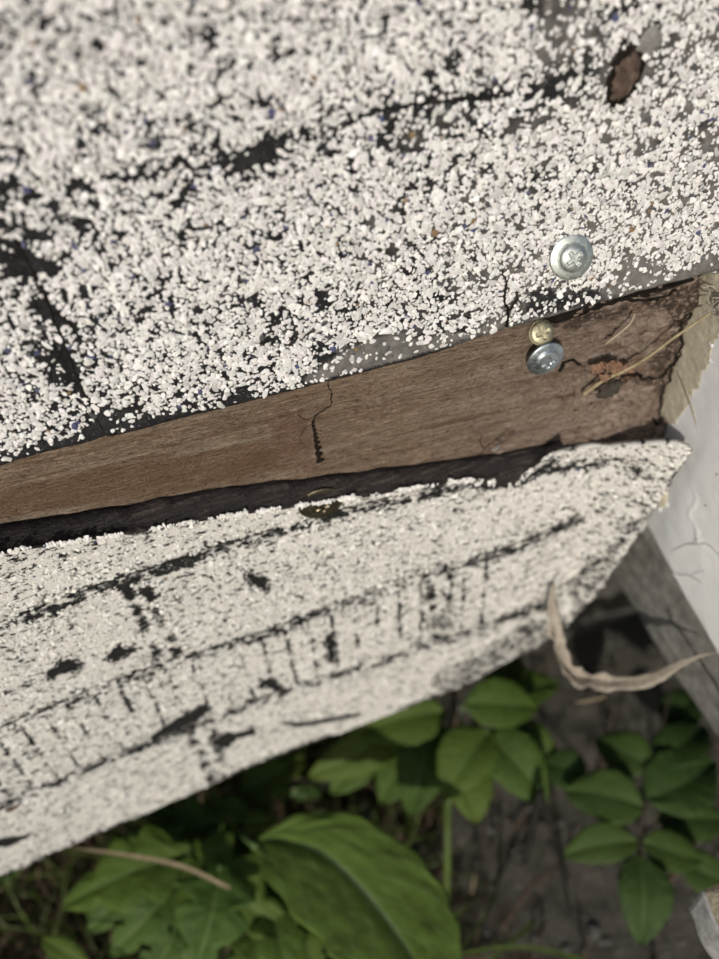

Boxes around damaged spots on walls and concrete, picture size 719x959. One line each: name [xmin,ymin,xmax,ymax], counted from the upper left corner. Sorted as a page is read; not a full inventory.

peeling [521,247,719,439]
crack [298,381,333,463]
crack [667,609,719,692]